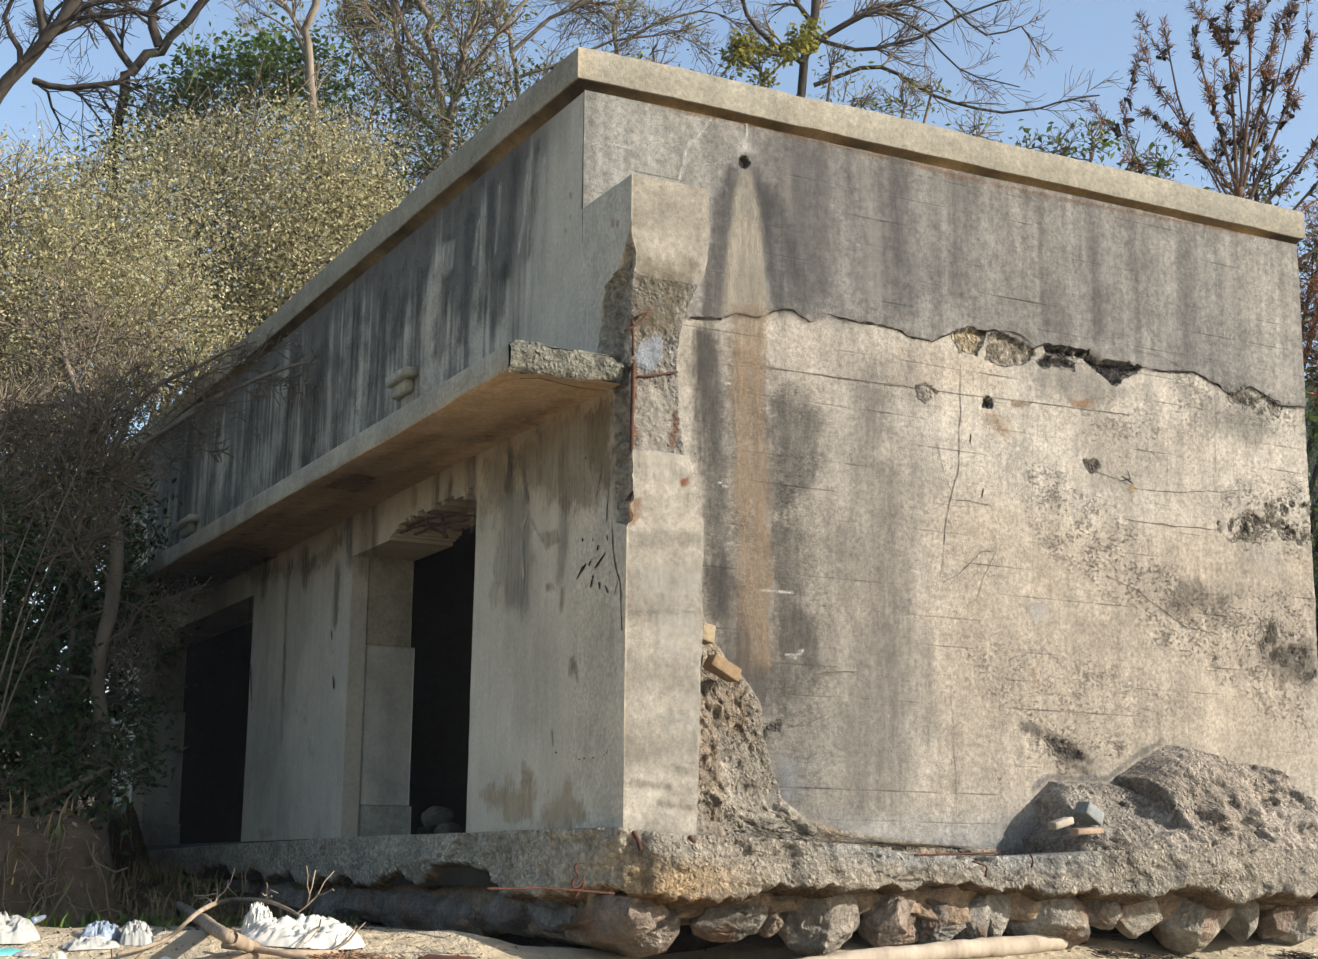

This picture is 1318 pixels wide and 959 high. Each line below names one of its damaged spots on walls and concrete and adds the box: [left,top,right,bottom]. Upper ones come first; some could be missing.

crack [690,309,1090,356]
spalling [630,319,678,452]
crack [1129,350,1307,407]
damp [695,171,817,706]
spalling [399,511,475,539]
spalling [763,719,782,740]
spalling [486,863,615,899]
spalling [914,852,998,877]